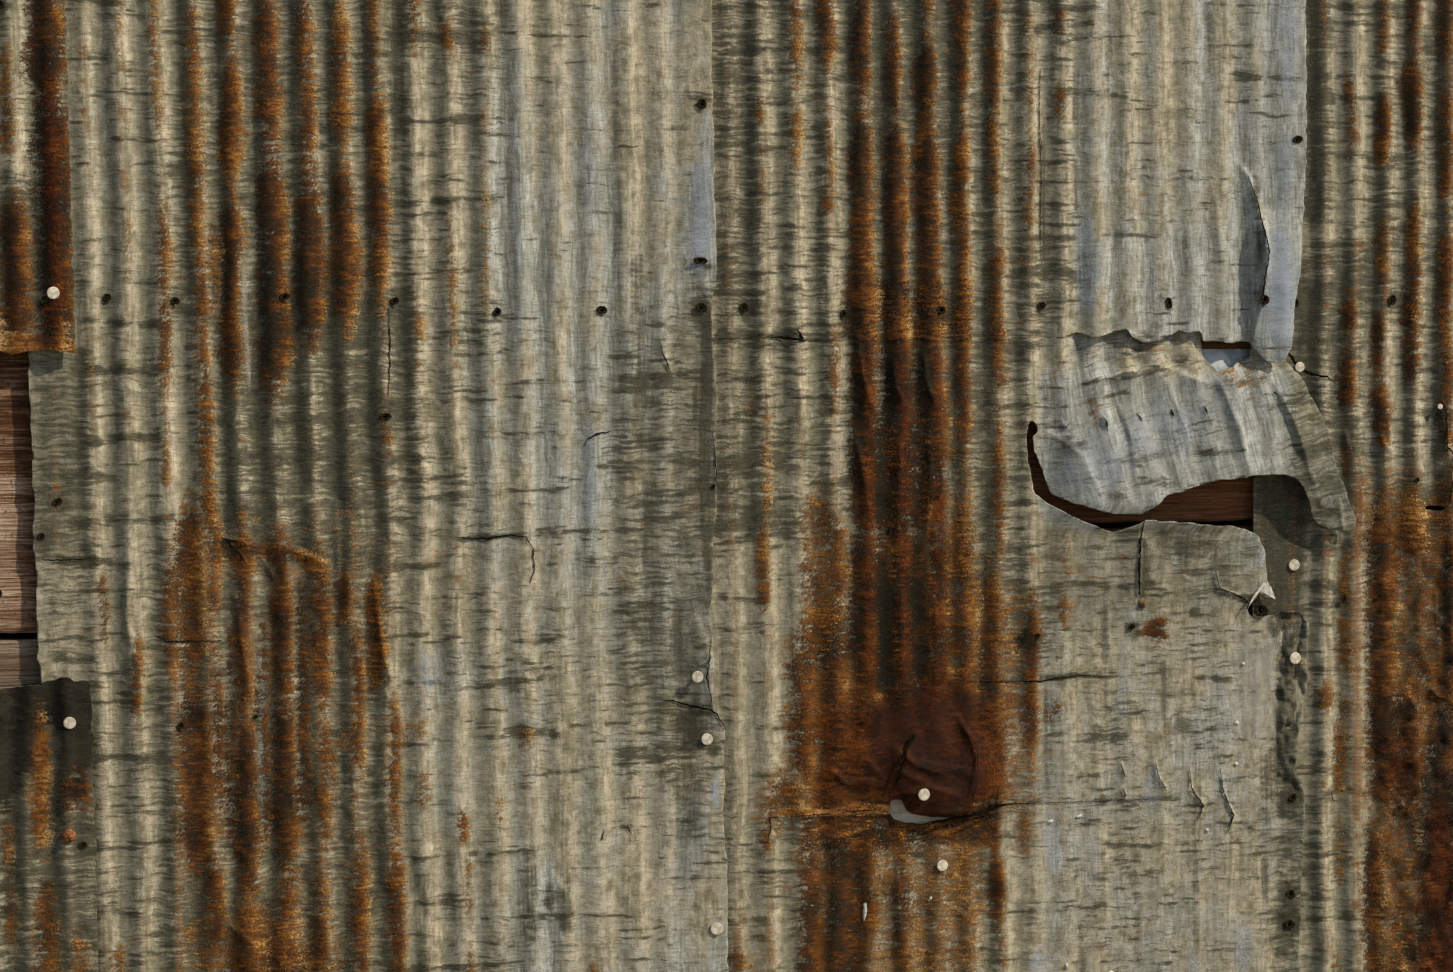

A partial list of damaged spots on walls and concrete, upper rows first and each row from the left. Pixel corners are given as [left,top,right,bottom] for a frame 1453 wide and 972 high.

corrosion [0,0,76,355]
corrosion [446,204,460,346]
corrosion [97,560,113,648]
corrosion [128,0,434,972]
corrosion [753,0,1077,972]
corrosion [1310,0,1453,972]
corrosion [2,698,130,972]
corrosion [457,809,474,915]
corrosion [727,946,756,972]